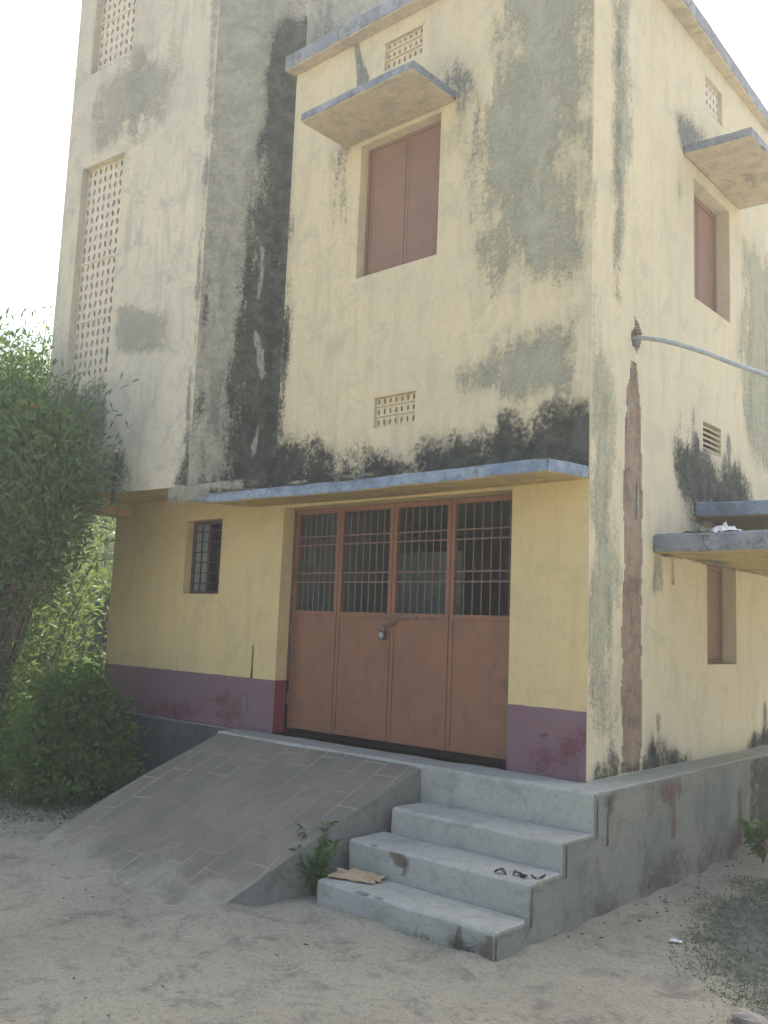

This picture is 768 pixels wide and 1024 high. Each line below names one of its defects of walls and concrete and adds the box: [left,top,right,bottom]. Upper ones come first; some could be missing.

damp [92,49,173,149]
damp [167,0,589,502]
damp [116,306,166,352]
damp [673,431,752,531]
spalling [620,316,643,773]
damp [594,716,691,780]